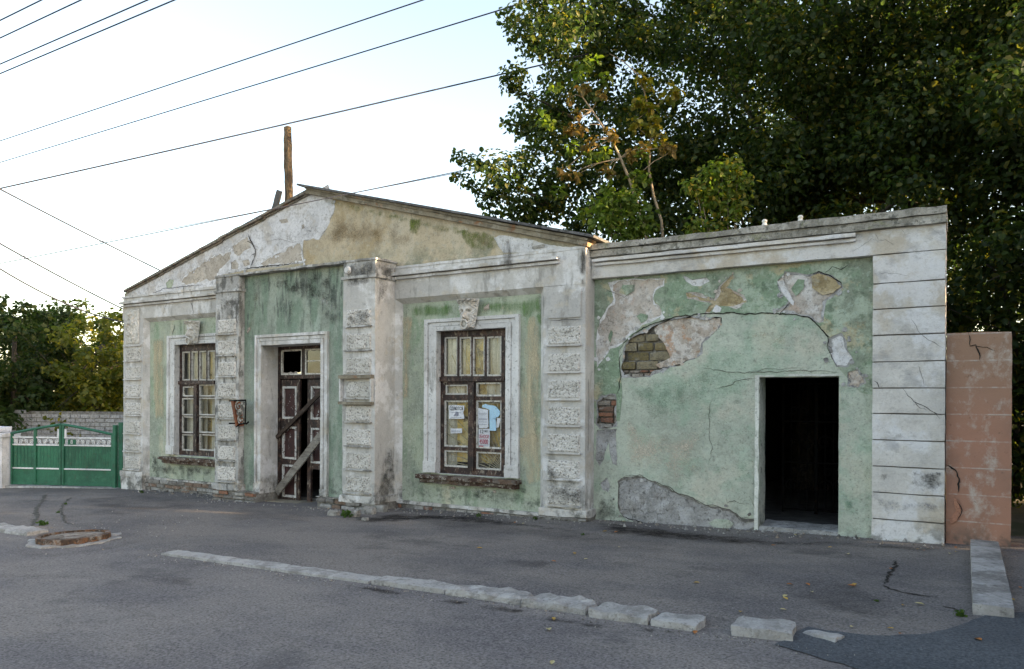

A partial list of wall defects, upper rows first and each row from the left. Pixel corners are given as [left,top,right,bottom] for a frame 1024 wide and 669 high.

peeling [127,185,335,295]
damp [463,231,493,248]
spalling [772,269,849,323]
spalling [594,272,747,378]
spalling [594,393,617,466]
spalling [601,476,754,530]
crack [945,464,962,520]